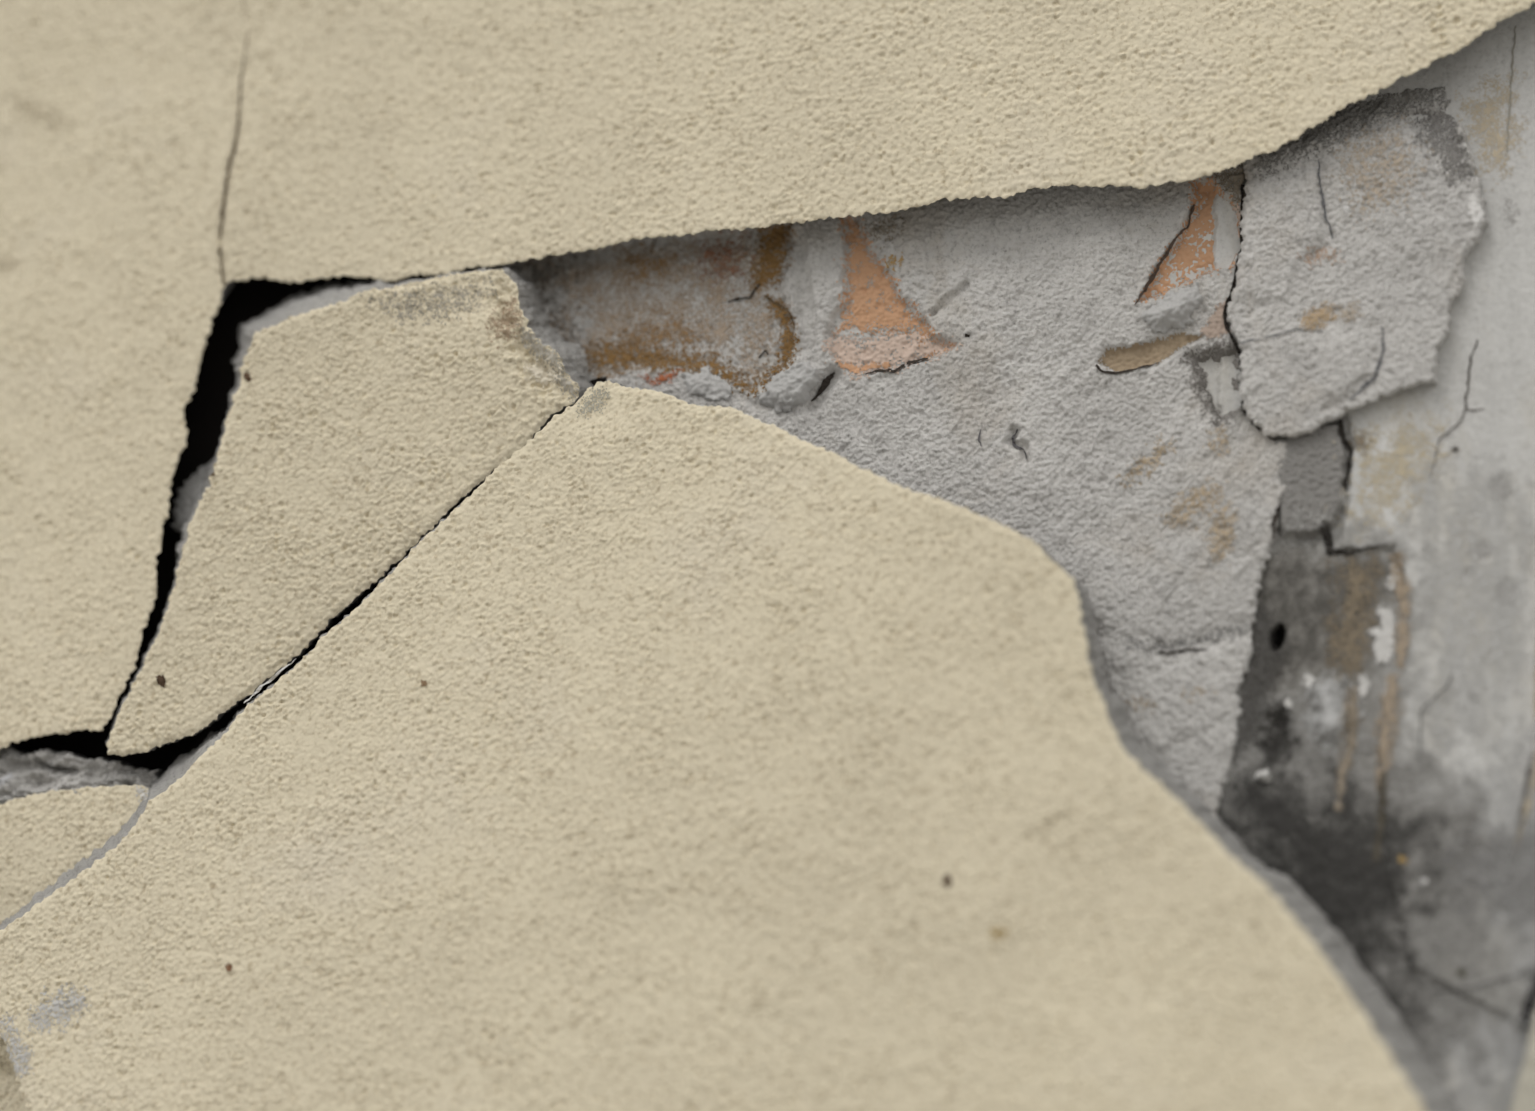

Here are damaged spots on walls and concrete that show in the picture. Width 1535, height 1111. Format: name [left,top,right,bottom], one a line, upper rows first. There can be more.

crack [140,1,461,654]
crack [590,377,607,387]
flaking render [821,215,963,381]
flaking render [1134,174,1246,303]
peeling [1467,189,1520,234]
crack [9,558,404,772]
spalling [0,504,461,930]
spalling [1033,504,1459,1111]
water stain [1115,385,1535,1111]